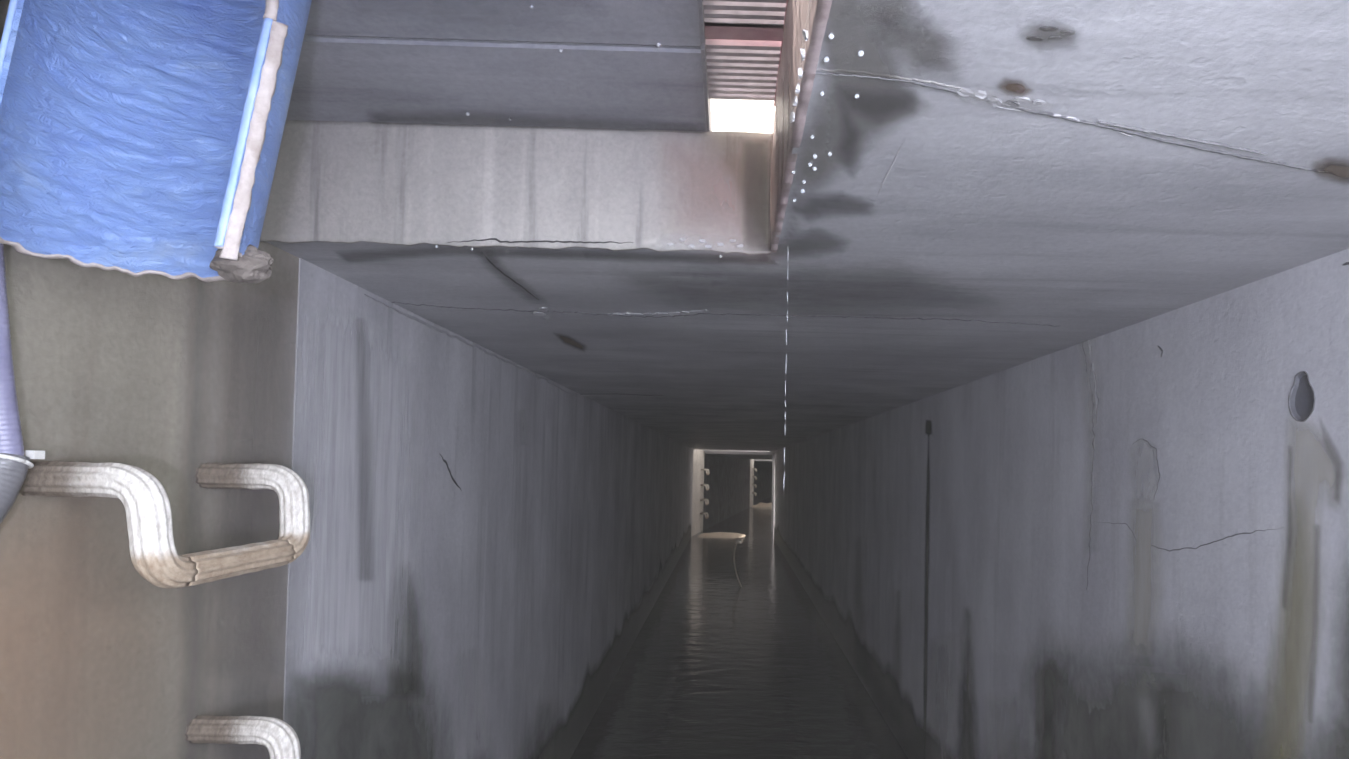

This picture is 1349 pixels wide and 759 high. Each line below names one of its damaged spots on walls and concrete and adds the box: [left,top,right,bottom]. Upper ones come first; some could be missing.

water stain [770,29,808,235]
water stain [802,0,908,178]
crack [803,68,1319,173]
crack [448,237,633,245]
crack [392,302,1056,327]
crack [1082,340,1278,590]
water stain [774,421,975,759]
water stain [1038,433,1349,759]